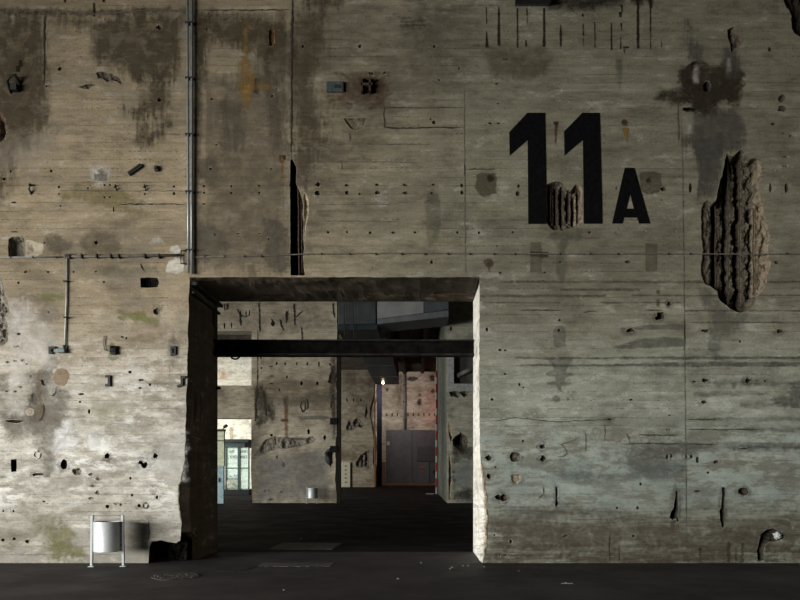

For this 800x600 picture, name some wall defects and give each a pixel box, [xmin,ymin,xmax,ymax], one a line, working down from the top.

leakage [0,11,48,197]
leakage [72,9,182,145]
leakage [656,43,744,196]
spalling [546,181,583,231]
spalling [701,149,771,313]
spalling [0,274,20,347]
spalling [757,528,783,561]